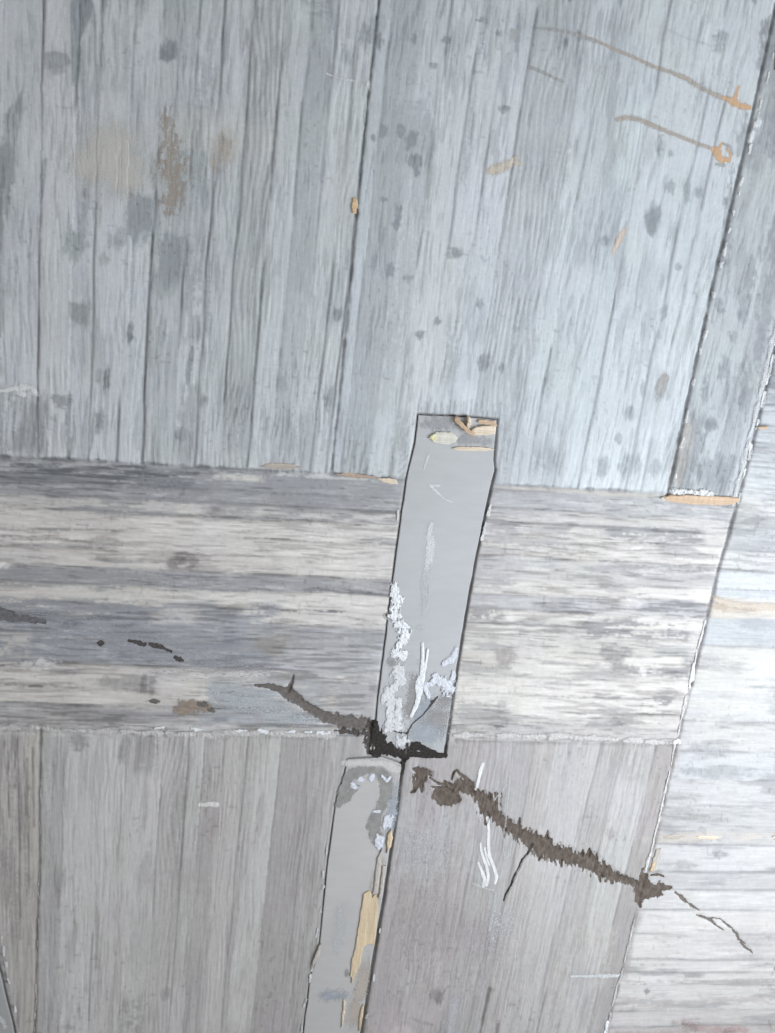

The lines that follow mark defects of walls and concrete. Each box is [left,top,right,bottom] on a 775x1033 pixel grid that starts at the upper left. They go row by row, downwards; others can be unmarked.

corrosion [534,26,752,110]
corrosion [614,115,734,168]
crack [0,607,46,624]
crack [97,639,184,662]
leakage [381,581,459,750]
crack [254,675,379,755]
crack [410,766,775,970]